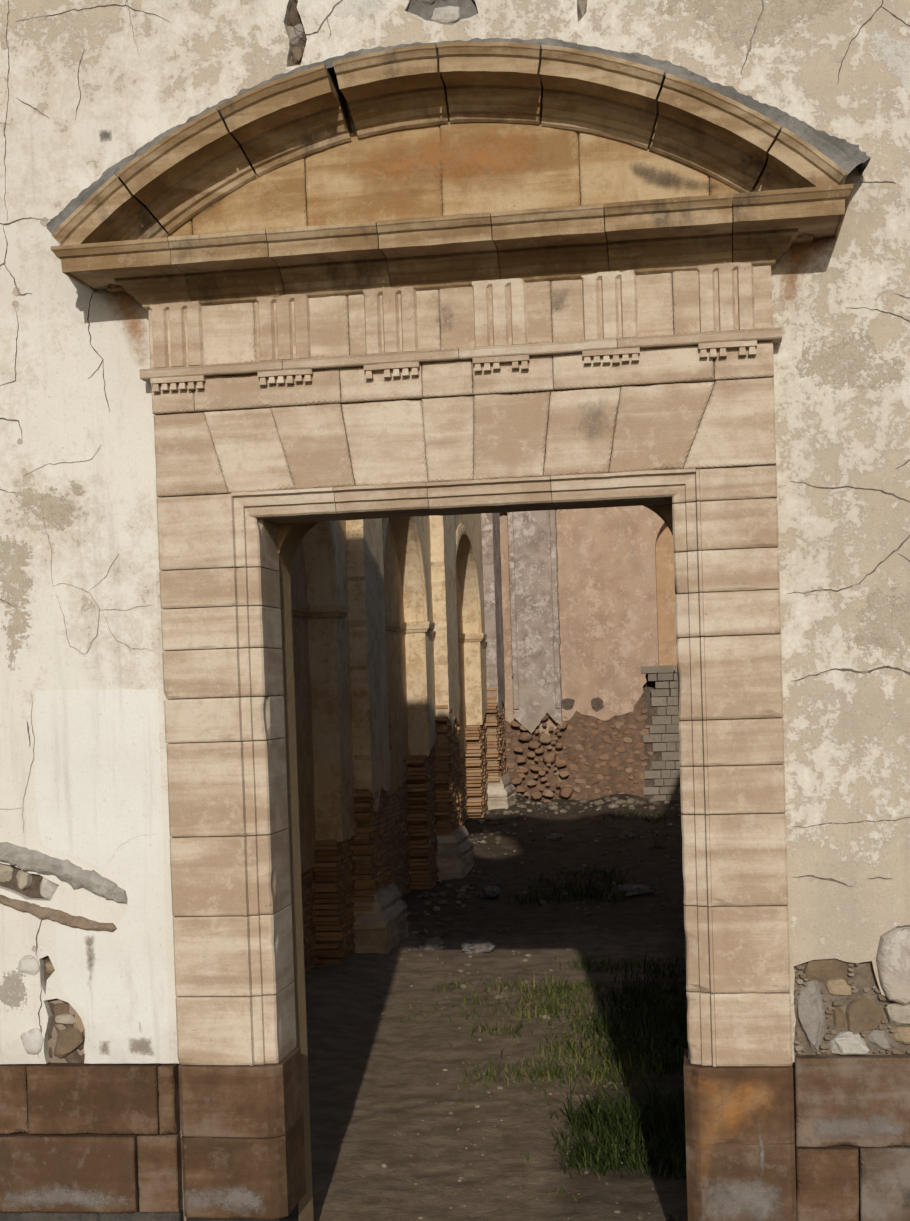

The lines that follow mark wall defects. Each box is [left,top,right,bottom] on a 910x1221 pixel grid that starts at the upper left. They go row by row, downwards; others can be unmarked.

spalling [408,0,478,25]
crack [0,0,166,386]
crack [87,290,110,410]
crack [793,459,910,502]
crack [787,535,910,597]
crack [794,665,910,681]
spalling [591,697,604,712]
crack [800,875,891,886]
peeling [0,968,28,1010]
spalling [44,956,55,985]
spalling [48,998,85,1063]
spalling [793,958,910,1063]